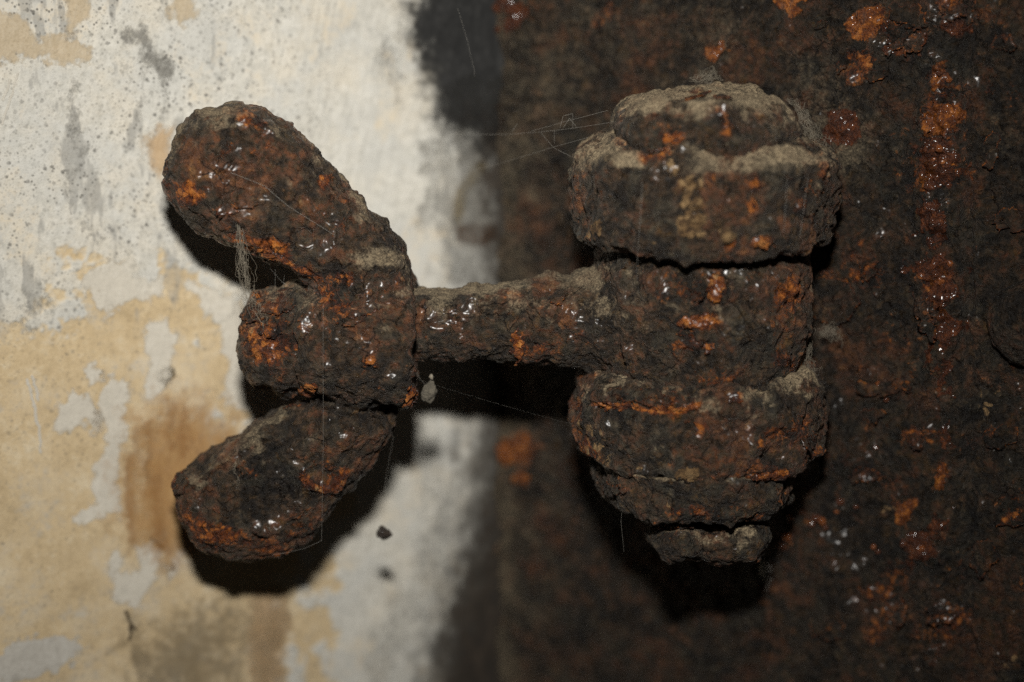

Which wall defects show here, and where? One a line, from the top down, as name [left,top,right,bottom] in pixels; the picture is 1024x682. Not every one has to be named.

spalling [0,0,91,66]
peeling [82,257,164,317]
peeling [144,317,178,400]
peeling [184,278,268,418]
rust [239,302,285,339]
rust [509,328,525,366]
rust [676,275,724,354]
rust [901,98,972,398]
rust [597,385,702,415]
peeling [54,360,130,525]
rust [129,409,229,550]
peeling [106,540,189,610]